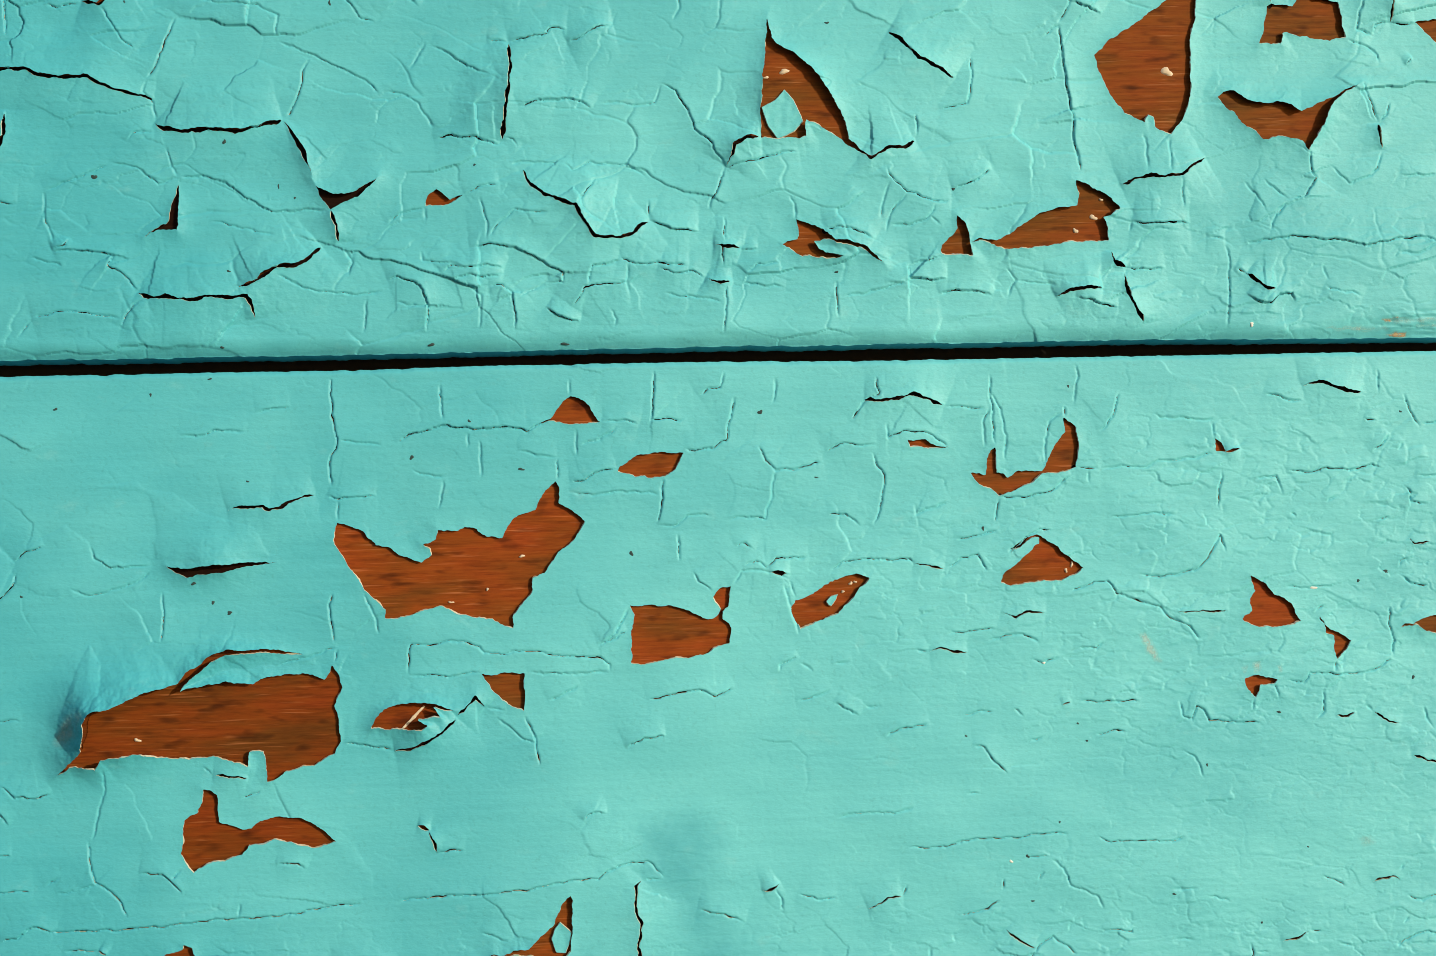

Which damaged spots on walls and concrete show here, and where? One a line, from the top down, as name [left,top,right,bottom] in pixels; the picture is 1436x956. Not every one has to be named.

peeling [755,7,877,162]
peeling [1090,0,1367,157]
peeling [936,176,1127,263]
crack [785,0,1436,333]
crack [67,542,167,648]
peeling [328,477,591,635]
peeling [625,581,738,672]
crack [223,361,1436,797]
peeling [50,643,350,788]
crack [0,770,667,956]
crack [696,805,1190,956]
crack [1320,861,1436,952]